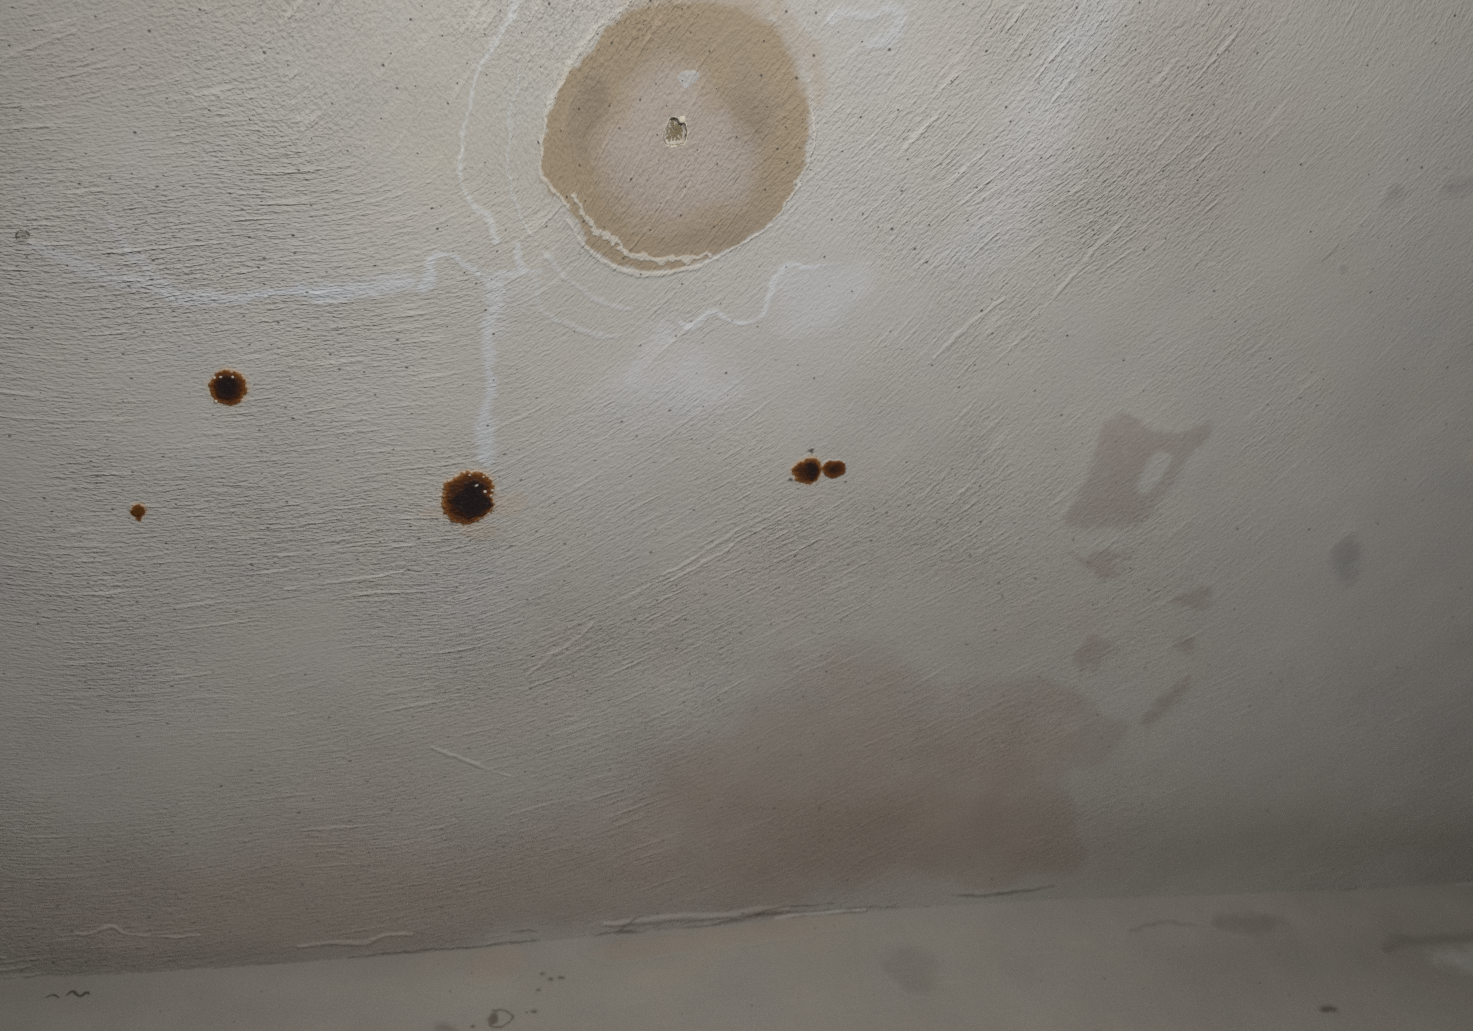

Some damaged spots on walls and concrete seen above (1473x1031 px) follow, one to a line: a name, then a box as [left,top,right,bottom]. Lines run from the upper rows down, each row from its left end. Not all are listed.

leakage [23,0,912,469]
corrosion [202,363,254,411]
corrosion [786,447,847,488]
corrosion [127,500,151,524]
corrosion [414,463,534,546]